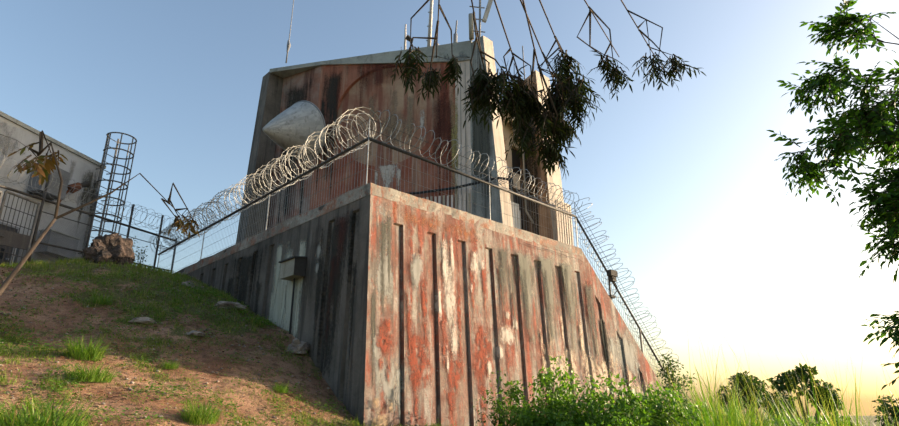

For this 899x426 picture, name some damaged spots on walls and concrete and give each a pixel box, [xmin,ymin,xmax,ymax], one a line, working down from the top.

rust [360,64,401,106]
rust [432,90,452,174]
rust [376,319,394,382]
rust [393,204,492,426]